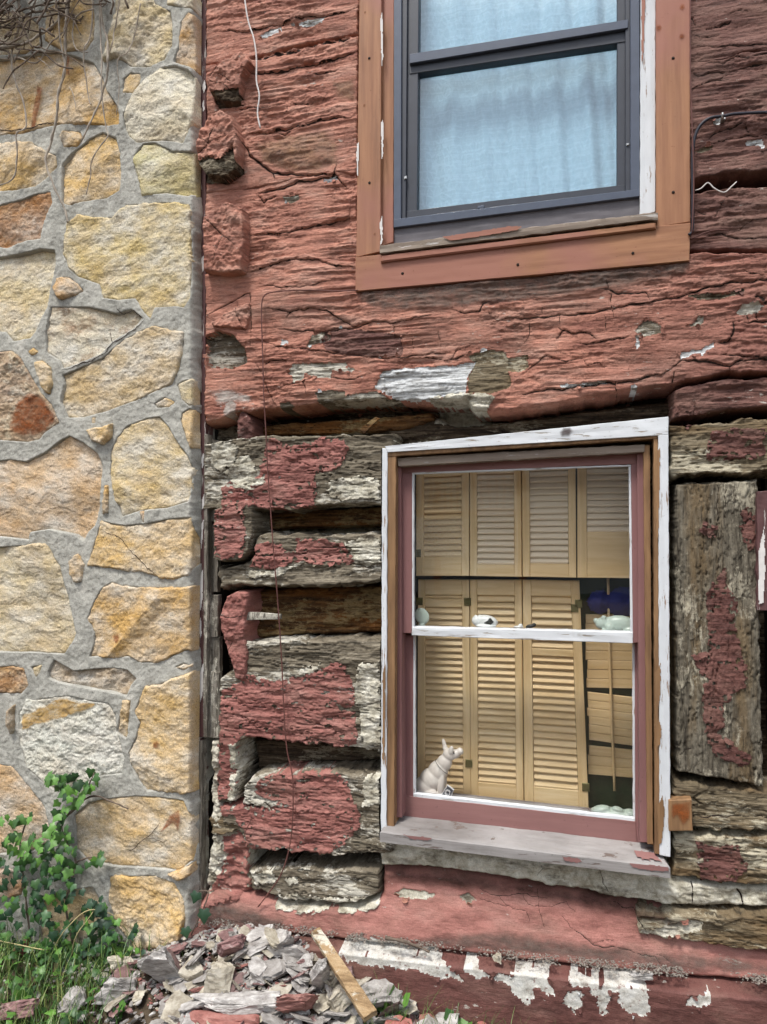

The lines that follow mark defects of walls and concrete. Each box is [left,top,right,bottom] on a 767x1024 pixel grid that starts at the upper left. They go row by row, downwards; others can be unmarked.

crack [198,7,357,203]
peeling [289,325,530,417]
crack [458,269,767,398]
peeling [678,343,714,359]
peeling [200,436,354,570]
peeling [739,507,766,604]
peeling [691,568,752,767]
peeling [203,662,361,909]
peeling [695,841,748,882]
crack [480,866,681,971]
peeling [339,936,650,1019]
peeling [686,985,711,1011]